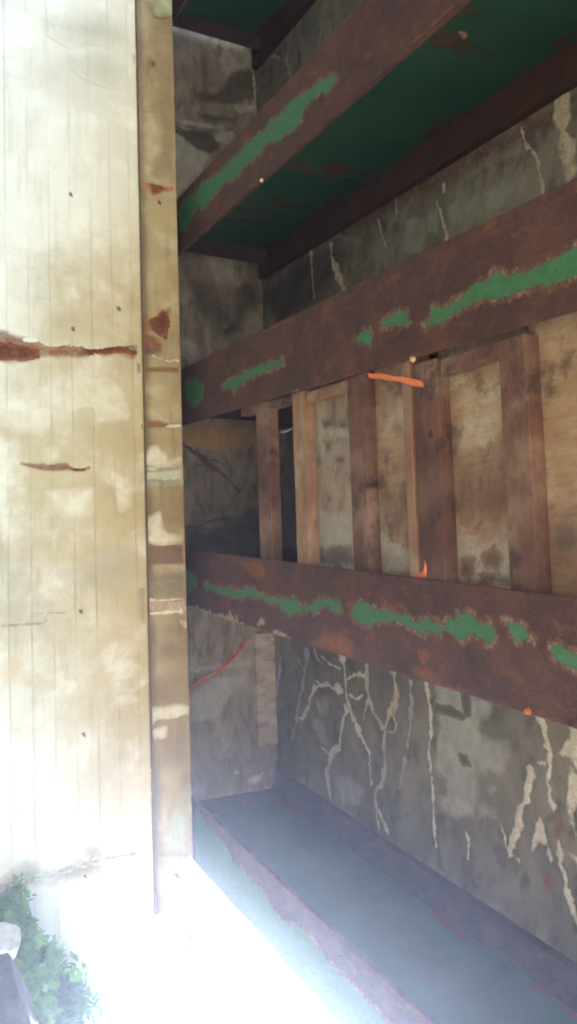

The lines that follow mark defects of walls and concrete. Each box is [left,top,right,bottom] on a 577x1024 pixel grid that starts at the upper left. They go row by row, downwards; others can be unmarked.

rust [141,181,175,197]
peeling [175,69,340,235]
rust [338,87,577,240]
water stain [552,92,577,183]
rust [0,305,180,374]
peeling [220,353,287,398]
peeling [352,238,577,350]
rust [19,461,92,473]
water stain [453,454,511,589]
peeling [150,566,577,679]
water stain [433,692,472,721]
water stain [501,716,577,925]